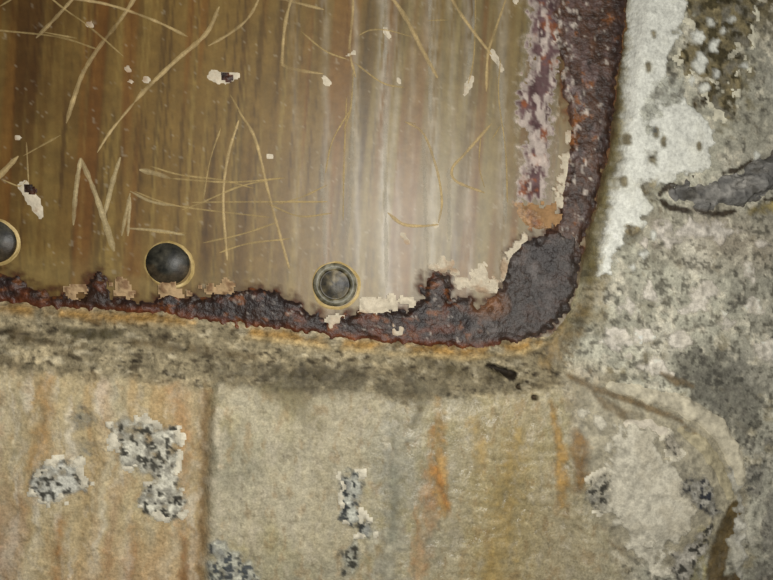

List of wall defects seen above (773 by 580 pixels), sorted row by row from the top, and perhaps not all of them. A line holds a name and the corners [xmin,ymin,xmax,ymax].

corrosion [0,0,627,349]
leakage [596,87,623,210]
flaking render [596,0,764,277]
leakage [66,329,123,340]
spalling [27,449,94,508]
spalling [105,413,189,523]
spalling [207,540,260,580]
spalling [336,468,379,575]
flaking render [577,409,721,580]
leakage [701,501,741,580]